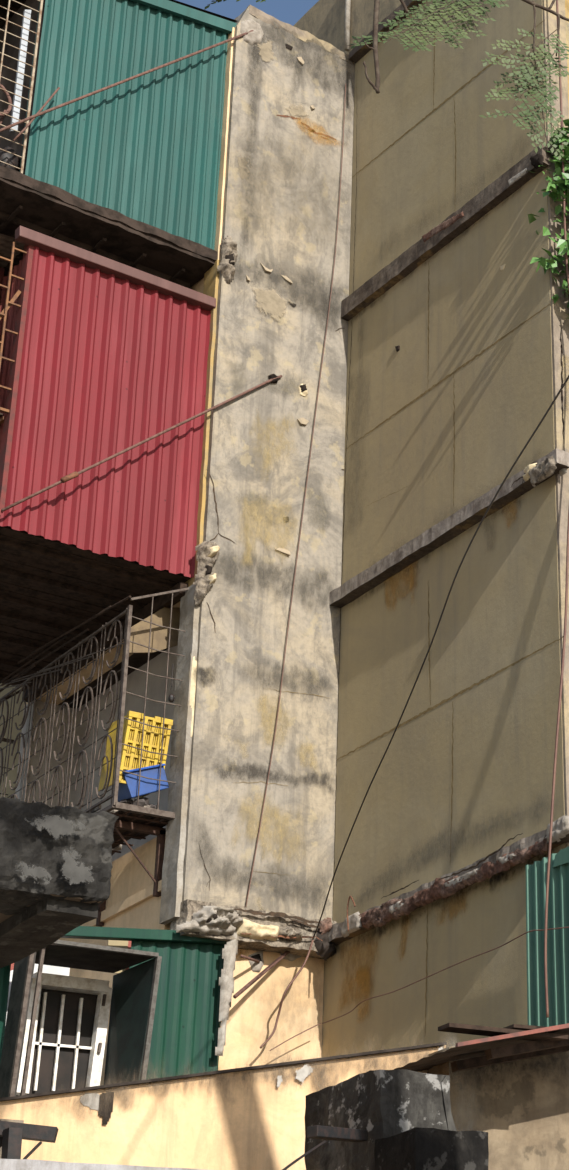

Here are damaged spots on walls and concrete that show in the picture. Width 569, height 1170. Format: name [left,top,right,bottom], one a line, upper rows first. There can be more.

damp [251,26,345,117]
damp [254,266,337,325]
damp [197,668,213,685]
damp [217,752,331,790]
peeling [15,815,95,885]
spalling [193,815,569,961]